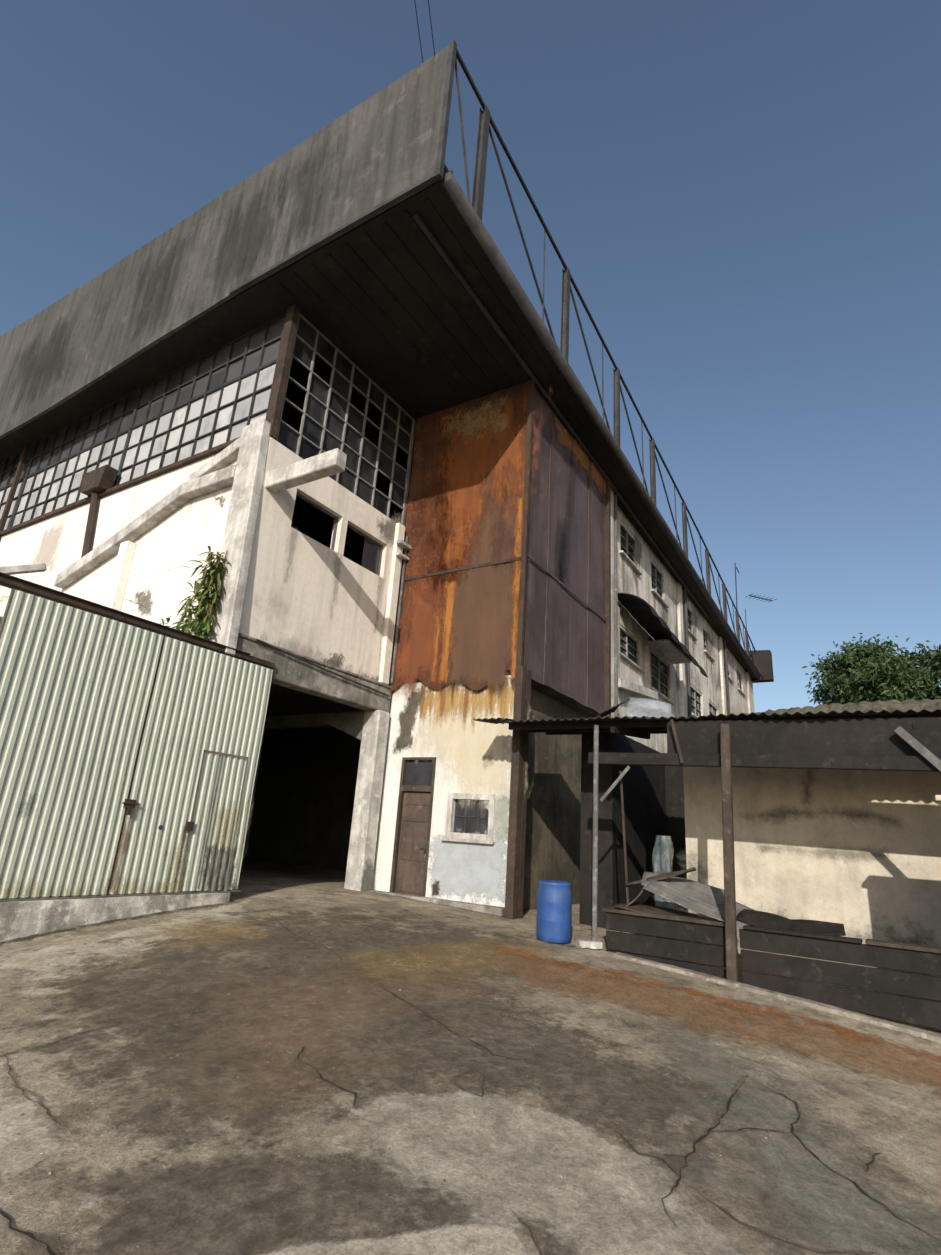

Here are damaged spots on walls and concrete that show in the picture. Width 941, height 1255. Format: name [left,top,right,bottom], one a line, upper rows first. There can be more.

water stain [135,591,153,616]
rust [389,388,613,727]
water stain [819,850,881,858]
water stain [352,941,551,977]
rust [486,944,941,1089]
crack [0,1019,146,1130]
crack [607,1074,940,1255]
crack [0,1211,55,1255]